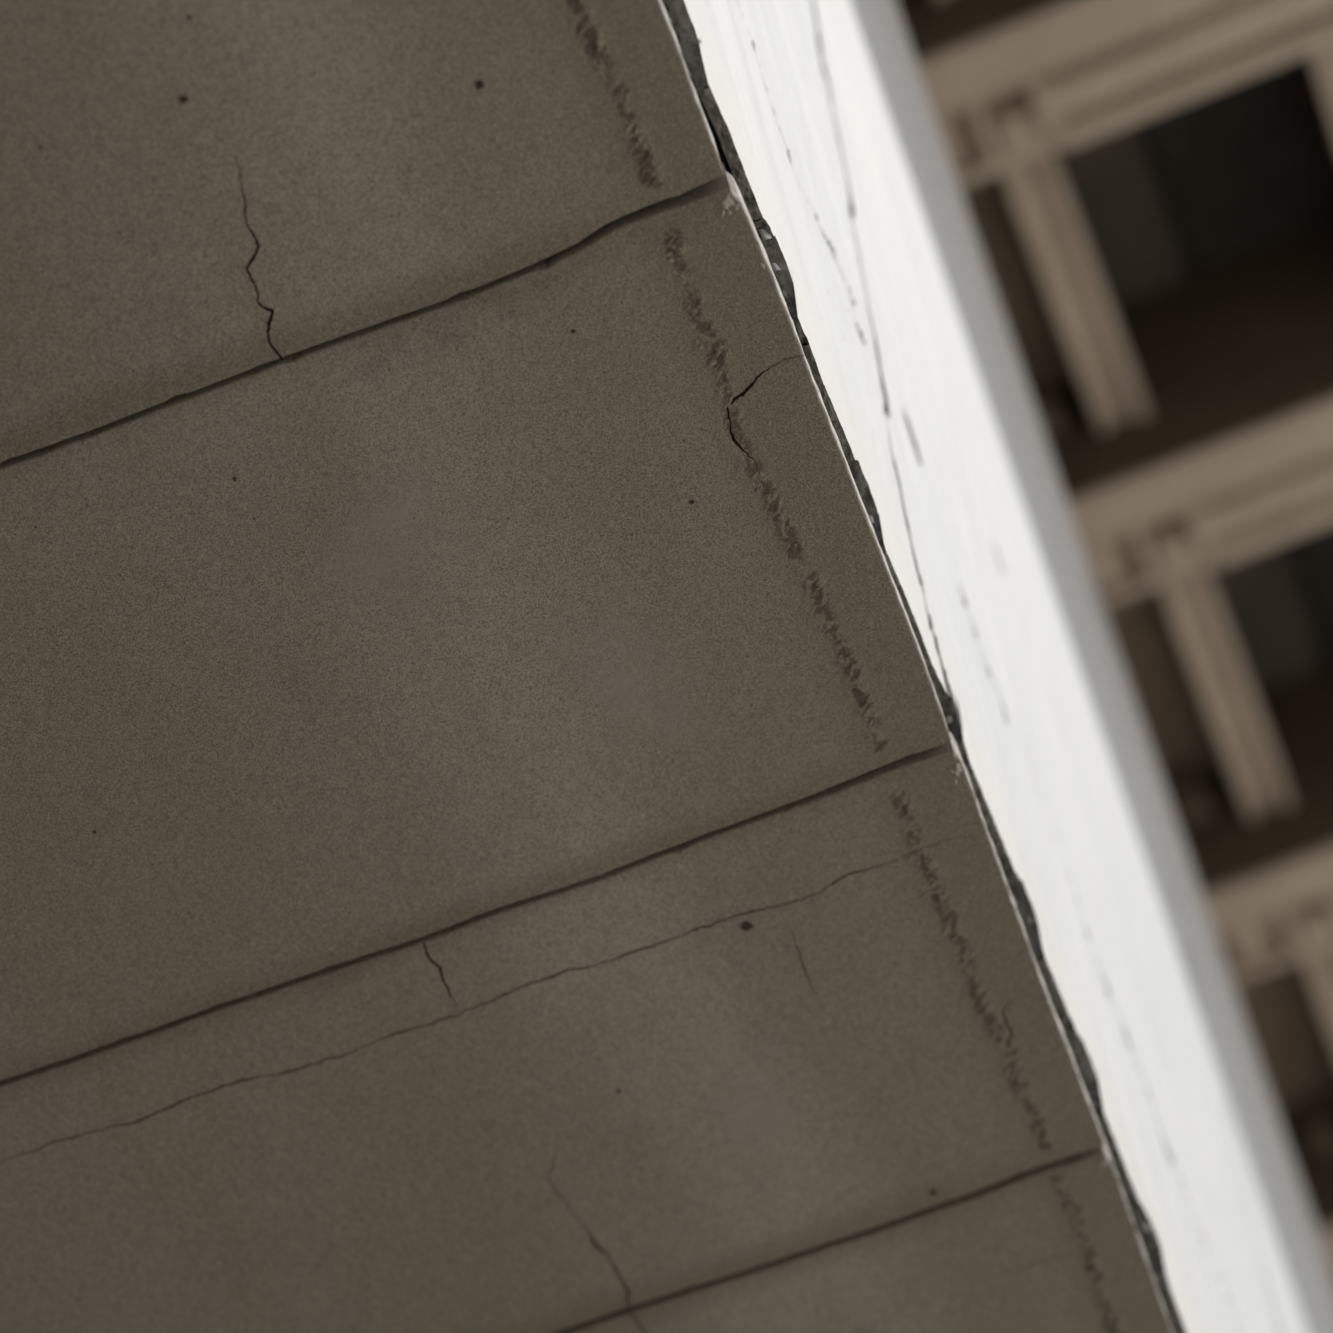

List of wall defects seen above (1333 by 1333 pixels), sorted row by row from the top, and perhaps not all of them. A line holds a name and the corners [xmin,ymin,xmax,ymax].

crack [235,153,283,360]
crack [726,0,964,732]
crack [0,835,974,1164]
crack [548,1153,645,1333]